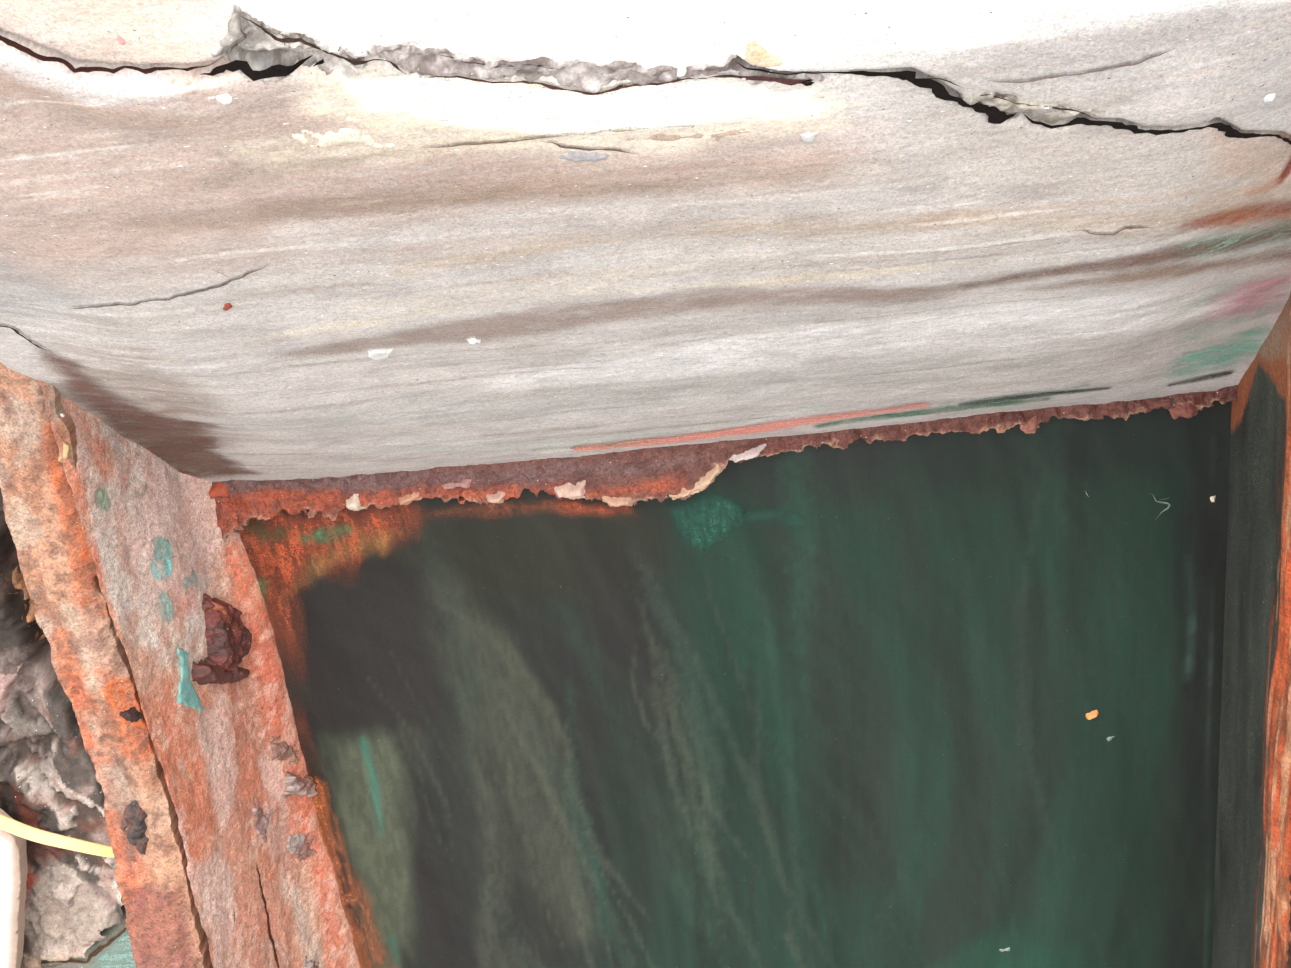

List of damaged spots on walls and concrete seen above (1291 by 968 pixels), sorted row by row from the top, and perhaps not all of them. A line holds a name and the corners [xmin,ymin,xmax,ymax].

crack [0,16,1291,145]
crack [419,125,694,154]
corrosion [1259,160,1291,192]
corrosion [45,354,255,499]
corrosion [1020,415,1039,434]
corrosion [1168,402,1199,419]
corrosion [441,479,471,490]
corrosion [459,480,634,516]
corrosion [666,444,766,500]
corrosion [119,707,144,723]
corrosion [121,800,149,855]
corrosion [269,736,386,968]